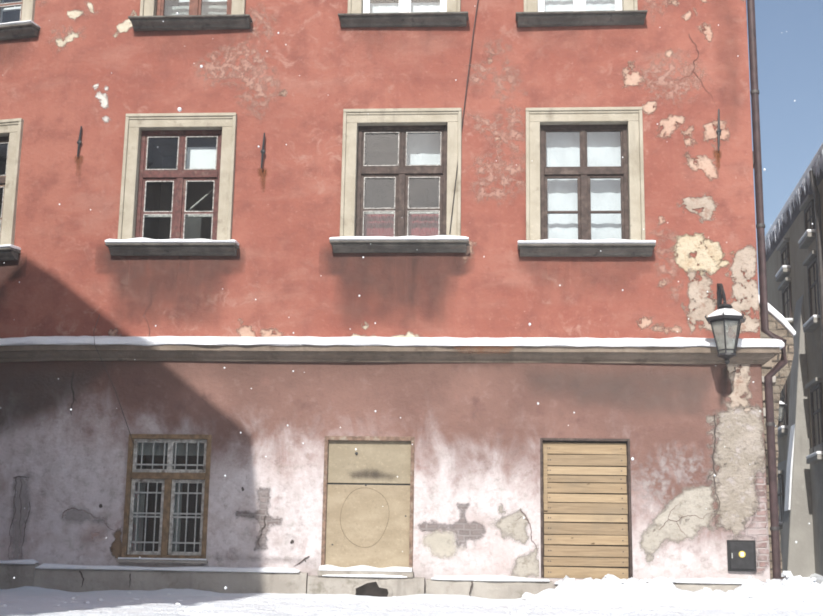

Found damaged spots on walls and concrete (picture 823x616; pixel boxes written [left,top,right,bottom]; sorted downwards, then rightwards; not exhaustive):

peeling [51,2,93,50]
peeling [114,10,137,37]
peeling [622,50,703,114]
peeling [657,114,730,181]
peeling [680,195,717,223]
flaking render [636,216,759,334]
crack [659,414,720,534]
flaking render [640,364,769,573]
flaking render [511,548,539,577]